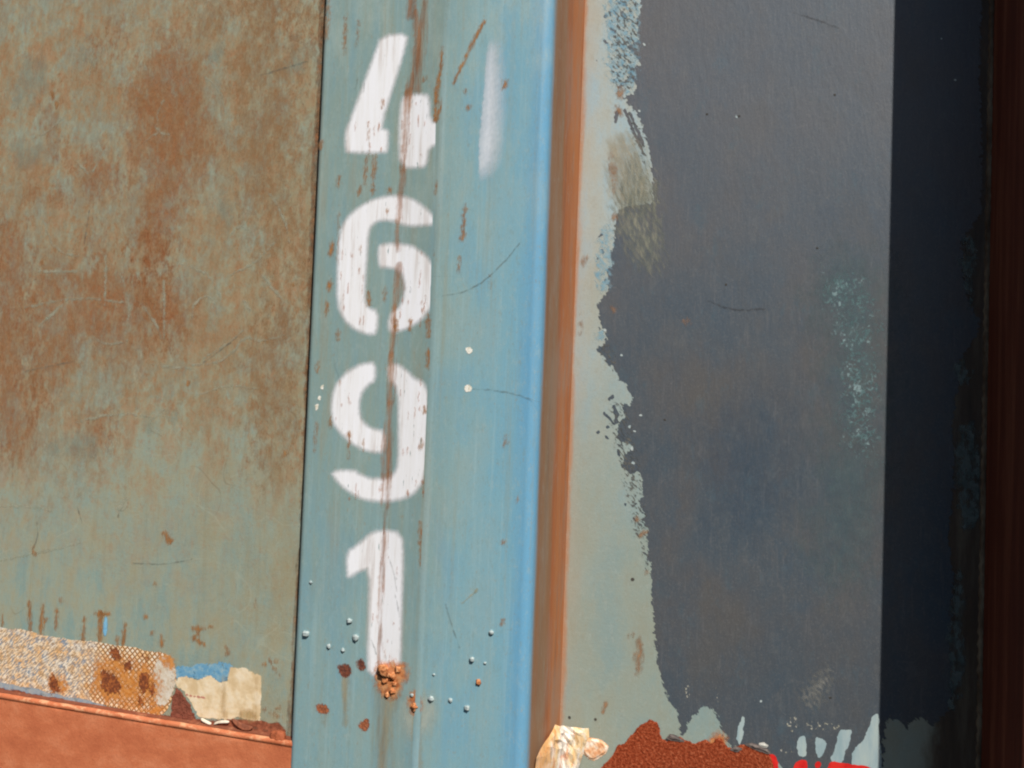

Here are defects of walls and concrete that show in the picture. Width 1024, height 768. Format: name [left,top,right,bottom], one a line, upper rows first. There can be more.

corrosion [319,0,329,70]
peeling [606,0,639,93]
corrosion [313,96,322,167]
corrosion [304,323,318,456]
peeling [611,403,649,571]
corrosion [28,602,58,635]
corrosion [0,673,68,699]
corrosion [90,624,295,733]
peeling [176,662,233,682]
corrosion [337,659,415,714]
peeling [601,719,774,768]